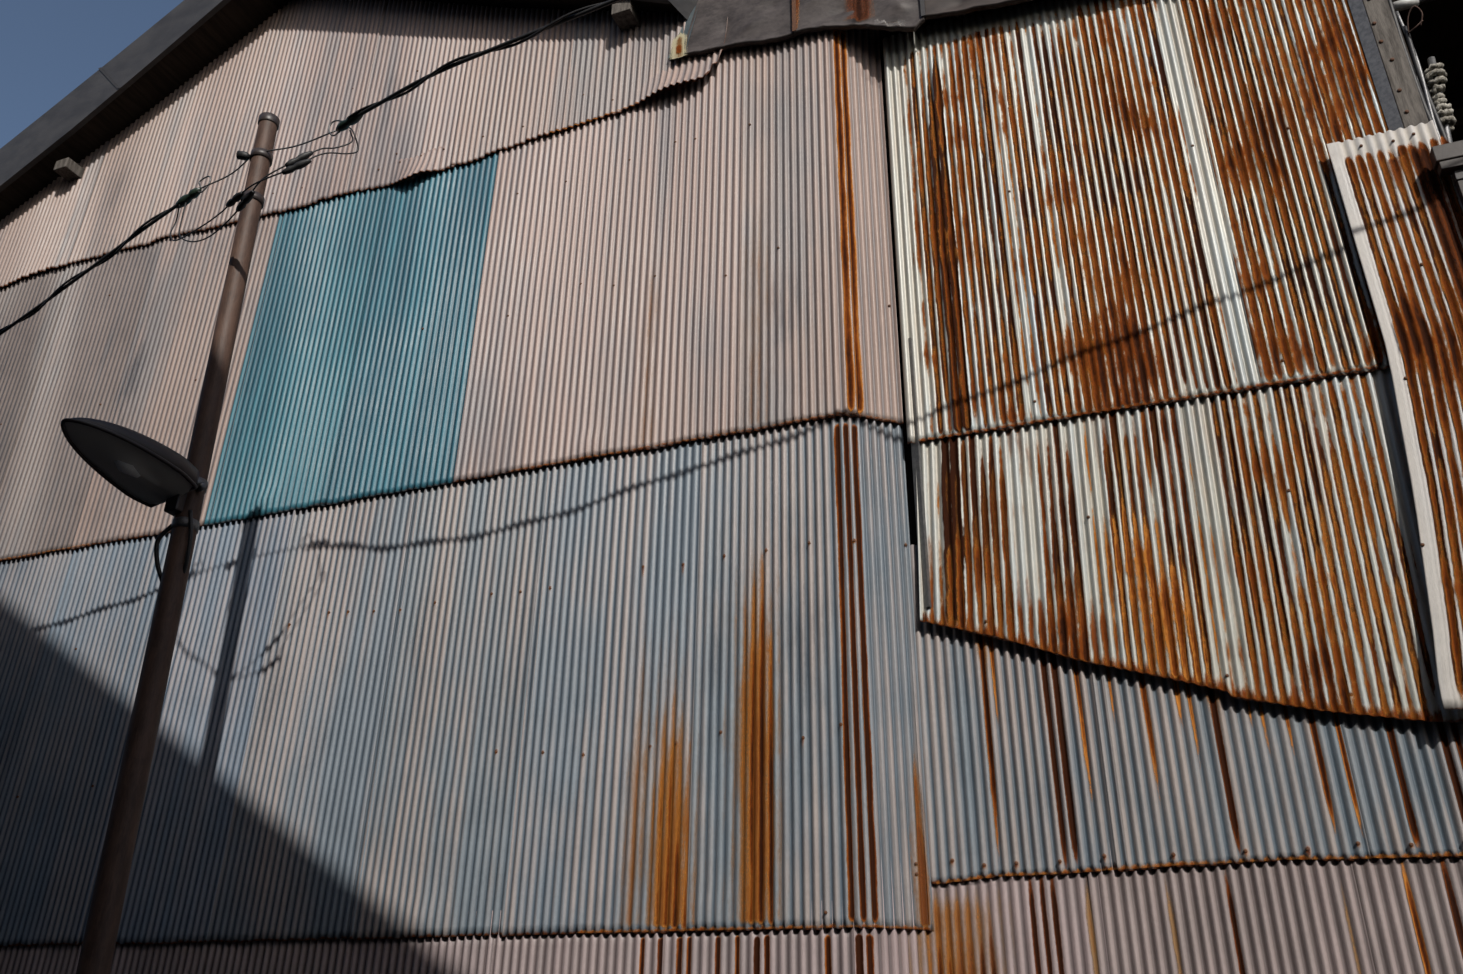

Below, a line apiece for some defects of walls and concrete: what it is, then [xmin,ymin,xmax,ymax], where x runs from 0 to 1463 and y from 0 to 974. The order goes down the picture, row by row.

corrosion [512,0,1463,974]